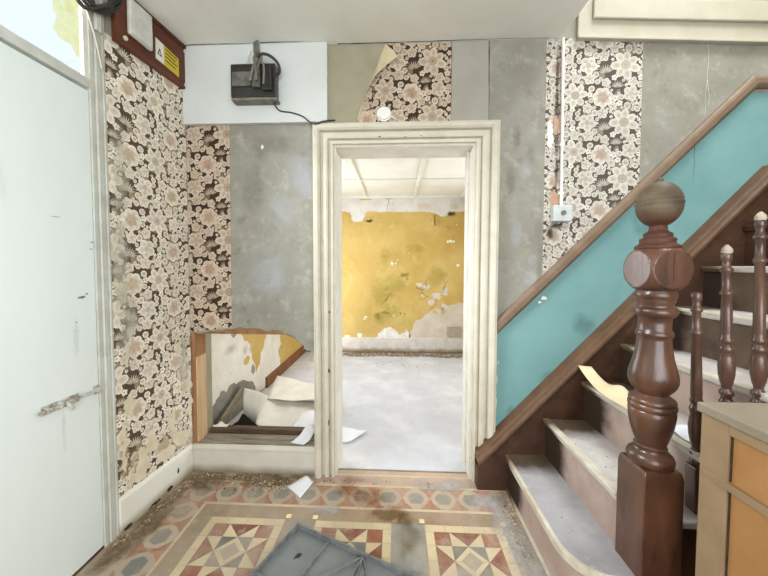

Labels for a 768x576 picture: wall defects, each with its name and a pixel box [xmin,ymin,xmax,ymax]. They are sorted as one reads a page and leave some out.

peeling [342,198,465,222]
peeling [377,283,464,339]
flaking render [190,323,315,447]